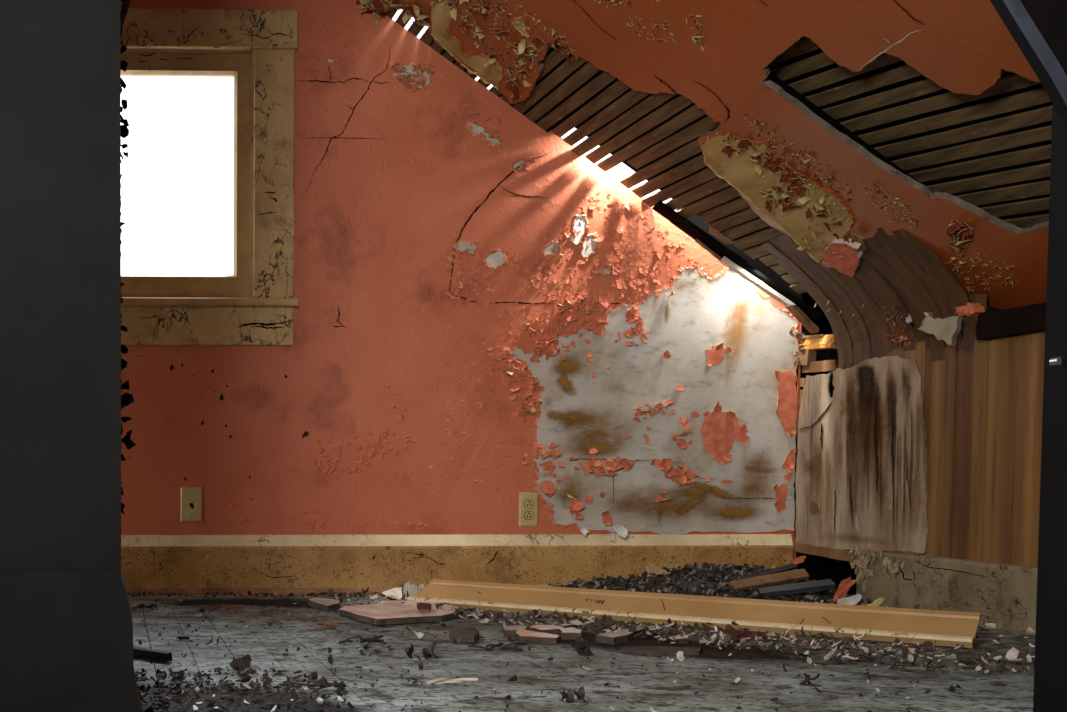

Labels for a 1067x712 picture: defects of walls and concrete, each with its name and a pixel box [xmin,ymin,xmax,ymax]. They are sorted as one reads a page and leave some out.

crack [863,0,925,67]
crack [296,46,391,191]
spalling [768,37,1052,229]
peeling [356,0,920,541]
peeling [945,219,1020,292]
leakage [626,482,754,519]
leakage [795,355,929,553]